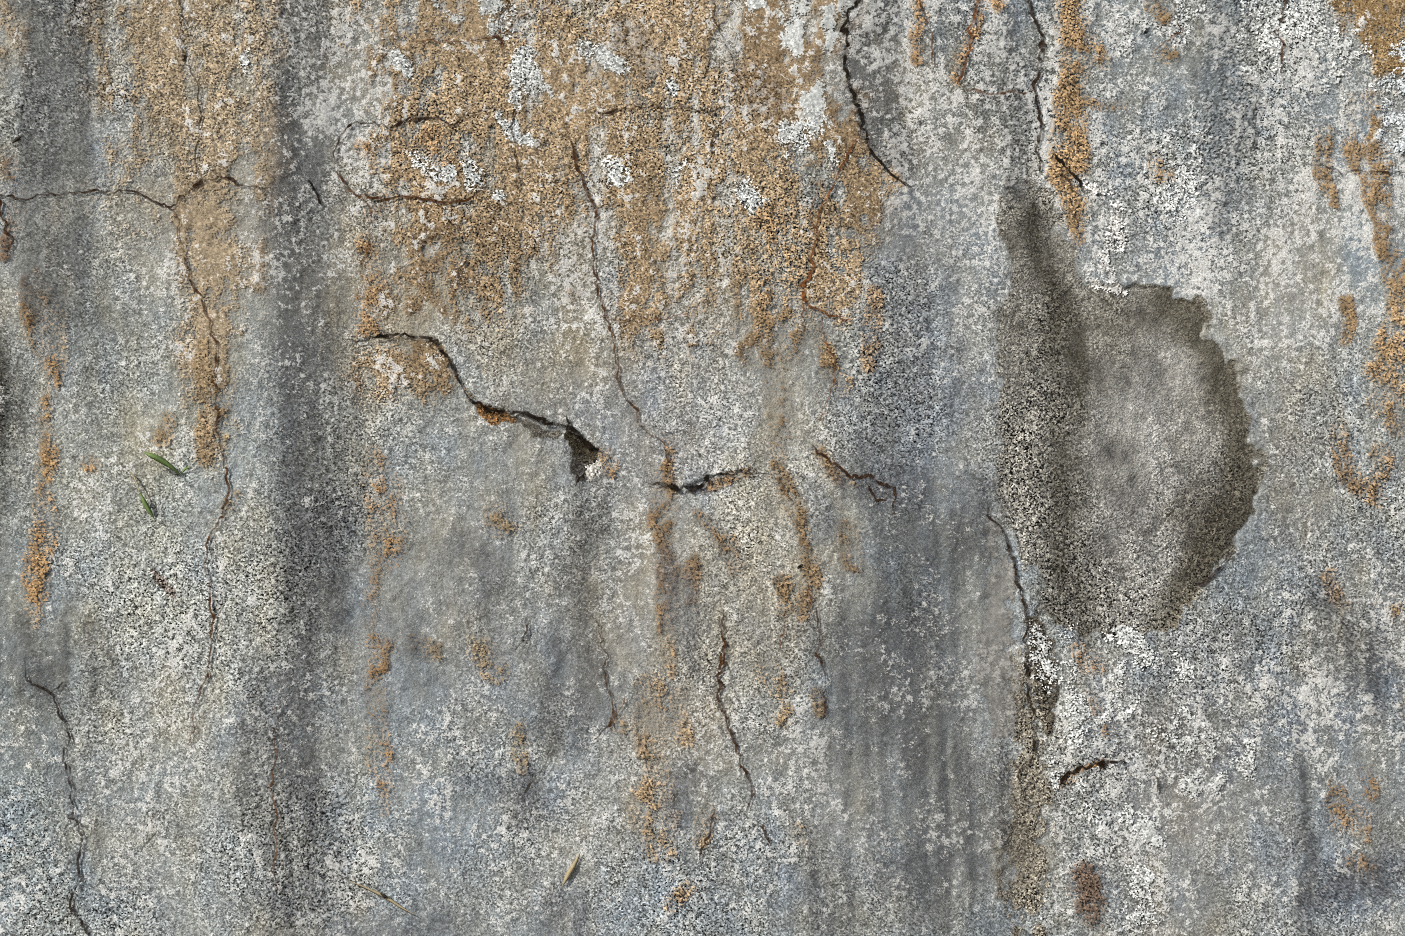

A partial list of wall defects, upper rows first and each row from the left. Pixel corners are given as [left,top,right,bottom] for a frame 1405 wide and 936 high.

crack [0,0,271,749]
crack [308,0,791,500]
peeling [317,0,907,482]
crack [799,0,911,515]
crack [919,0,1084,195]
peeling [1113,0,1210,61]
peeling [1144,127,1231,226]
peeling [1231,0,1405,154]
crack [25,664,89,936]
crack [592,616,625,740]
crack [779,579,827,719]
spalling [974,168,1269,936]